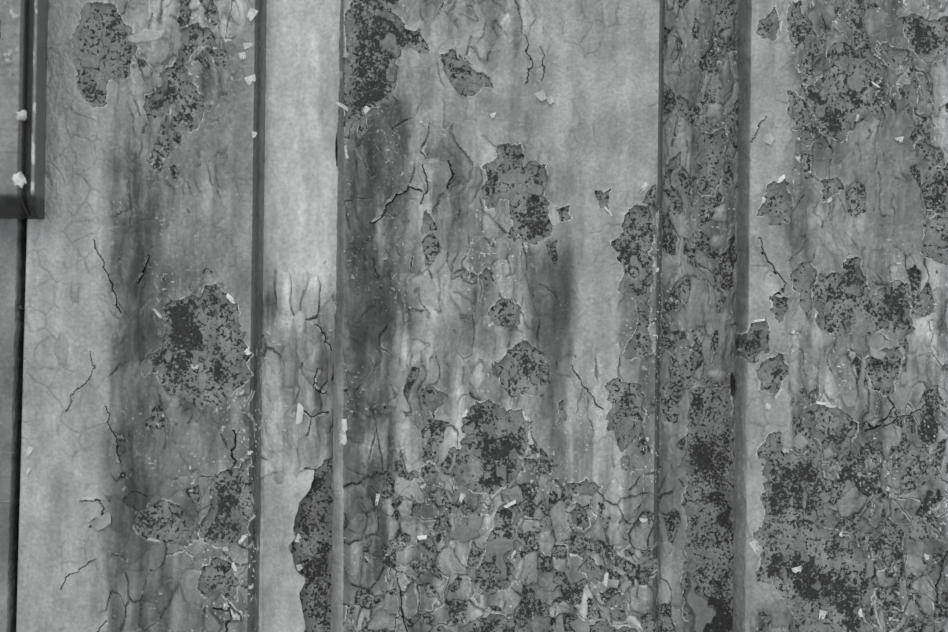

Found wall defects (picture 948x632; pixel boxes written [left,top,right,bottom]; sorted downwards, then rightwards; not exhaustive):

peeling [335,0,429,138]
crack [80,496,108,527]
crack [103,407,120,464]
peeling [140,285,252,407]
crack [212,608,232,630]
crack [227,431,236,469]
peeling [134,457,333,632]
crack [394,578,407,632]
peeling [421,341,567,632]
crack [569,366,601,408]
peeling [753,401,885,632]
peeling [736,255,914,399]